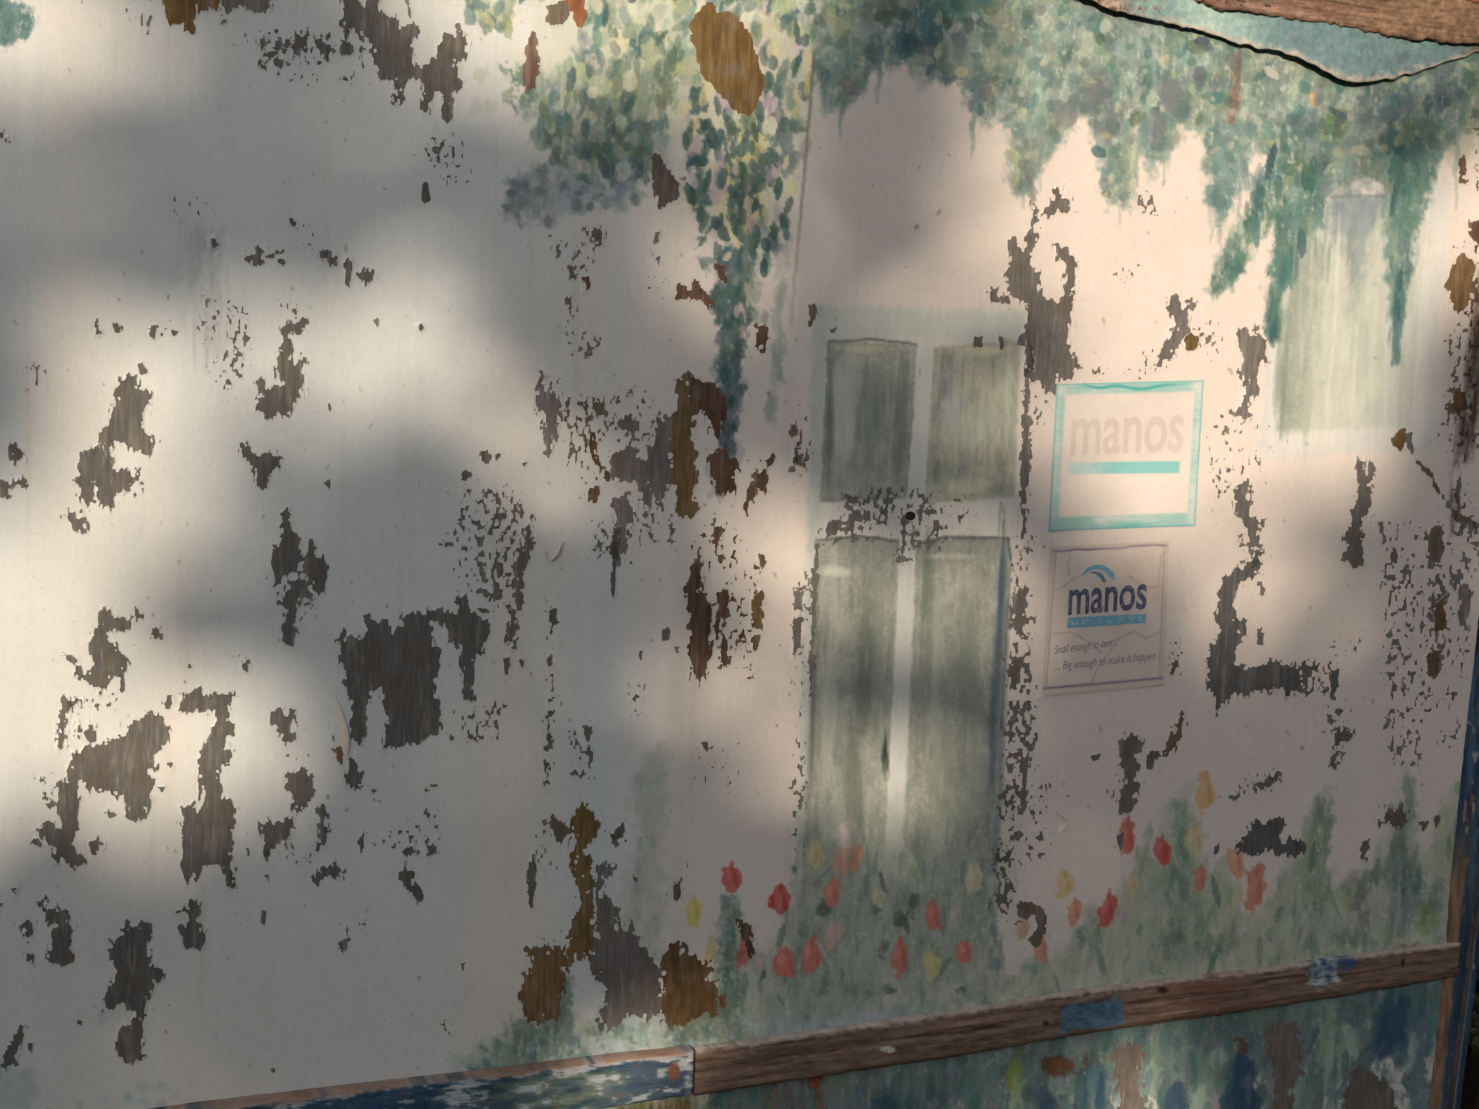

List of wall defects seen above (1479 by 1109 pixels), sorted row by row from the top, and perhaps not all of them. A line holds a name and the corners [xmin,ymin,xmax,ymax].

peeling [125,0,473,204]
peeling [1129,190,1158,216]
peeling [196,295,316,424]
peeling [29,357,813,951]
peeling [787,486,974,859]
peeling [973,178,1108,952]
peeling [1128,291,1479,773]
peeling [77,917,172,1070]
peeling [512,802,727,1033]
peeling [1089,701,1193,856]
peeling [1208,812,1319,862]
peeling [1339,1063,1403,1109]